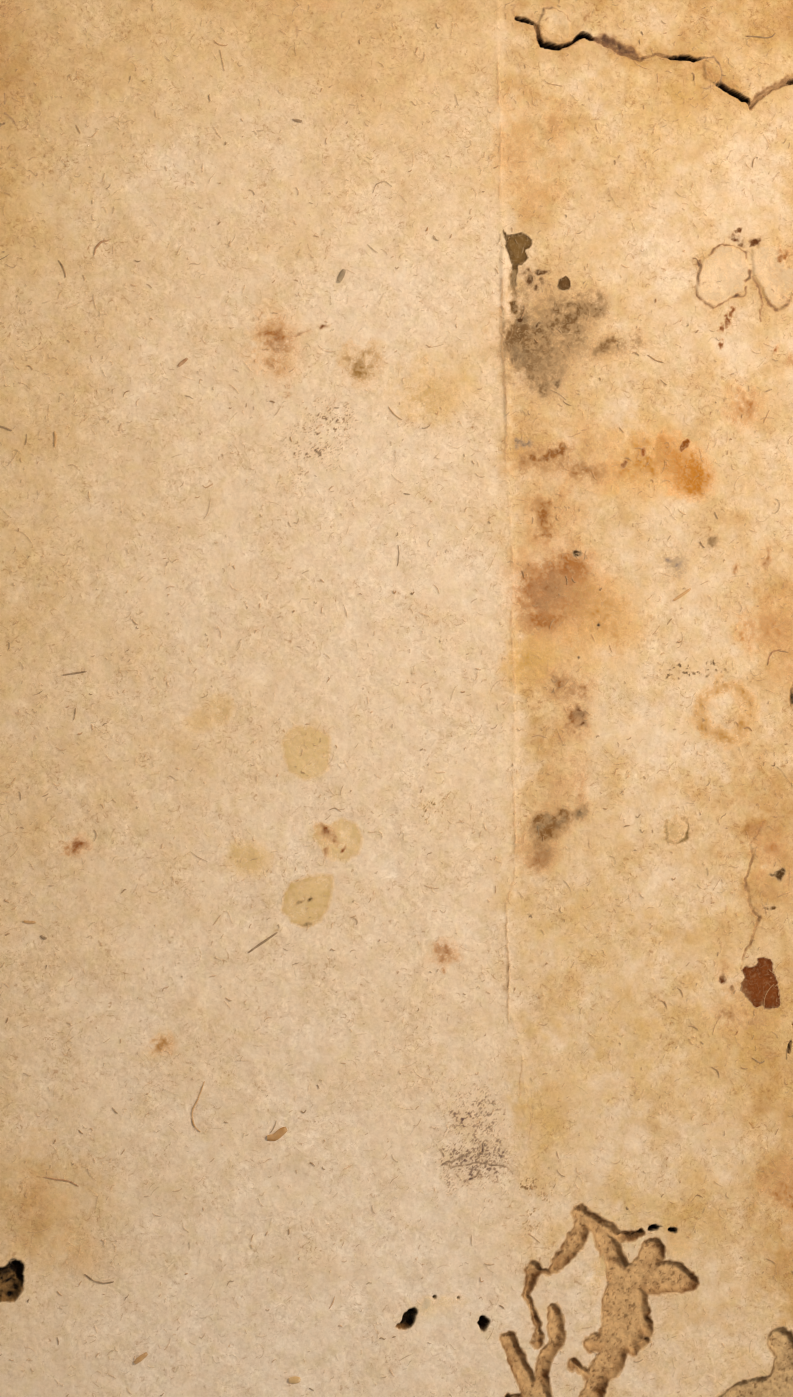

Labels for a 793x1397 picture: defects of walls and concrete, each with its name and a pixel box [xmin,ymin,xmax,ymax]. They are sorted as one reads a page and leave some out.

crack [514,7,793,110]
damp [501,272,642,398]
corrosion [604,433,713,497]
damp [516,439,625,658]
damp [512,649,588,741]
crack [743,854,761,957]
corrosion [718,957,780,1028]